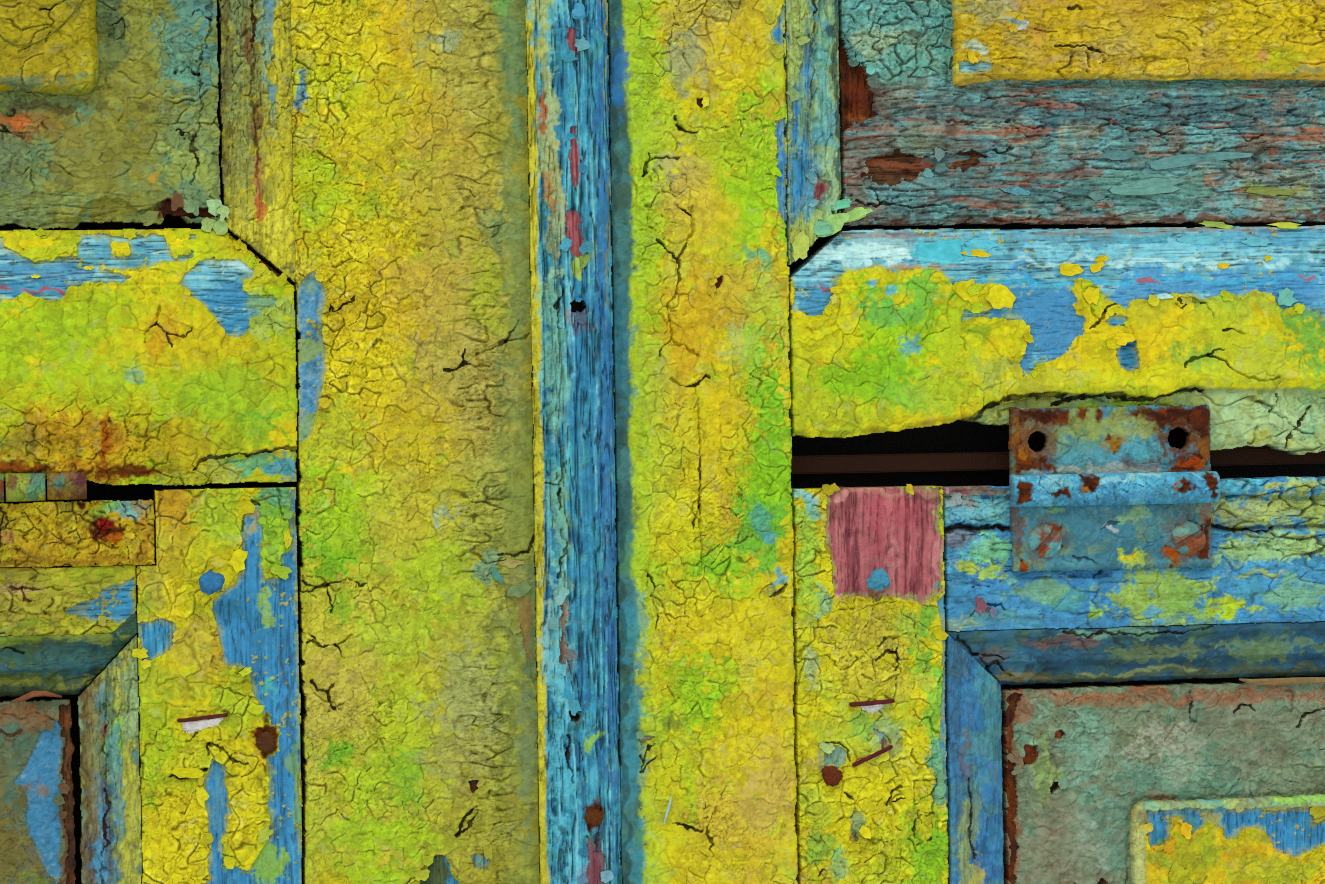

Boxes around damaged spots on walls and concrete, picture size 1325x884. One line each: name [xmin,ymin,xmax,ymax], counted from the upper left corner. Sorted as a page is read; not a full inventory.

peeling [0,192,332,443]
crack [443,349,471,373]
peeling [788,207,1325,379]
corrosion [1008,407,1123,549]
corrosion [1125,405,1220,500]
crack [497,534,568,579]
corrosion [1161,511,1212,568]
peeling [173,488,302,884]
crack [298,578,366,711]
crack [454,808,475,838]
corrosion [582,795,607,853]
peeling [1137,803,1325,857]